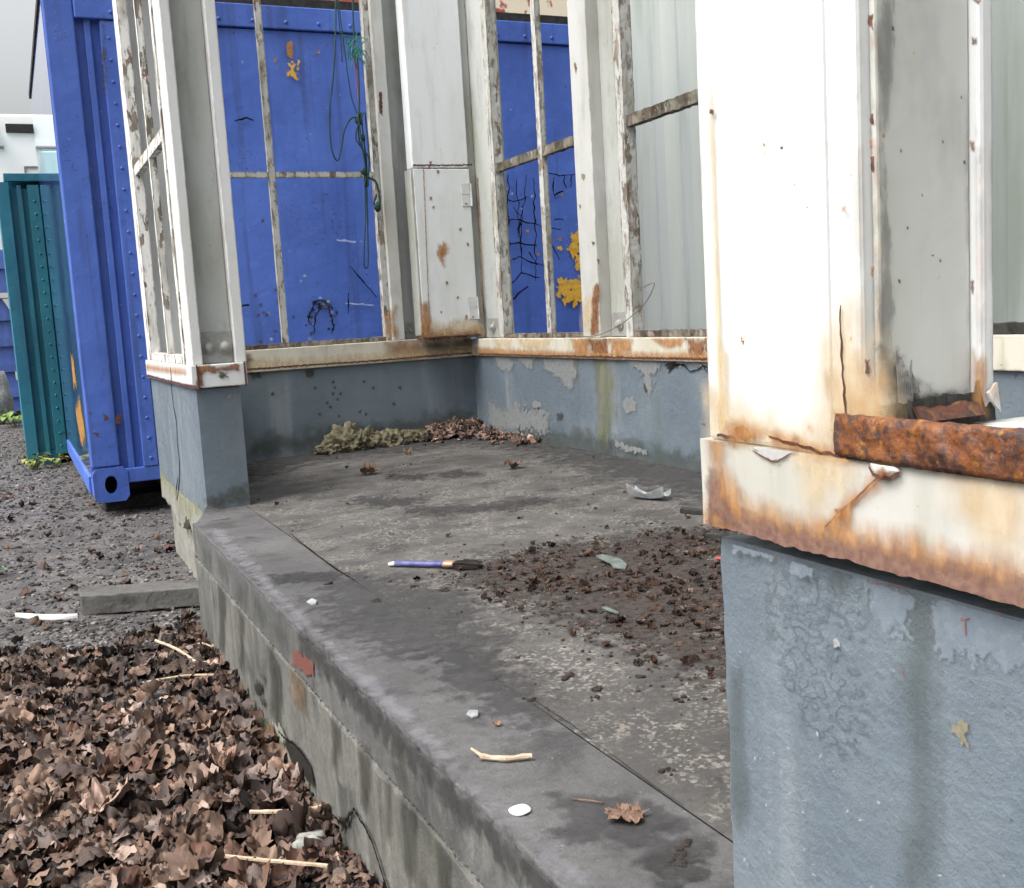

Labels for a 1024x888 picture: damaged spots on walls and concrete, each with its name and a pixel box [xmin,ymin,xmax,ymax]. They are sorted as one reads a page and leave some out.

rust [146,283,708,389]
peeling [495,356,578,391]
peeling [628,360,708,397]
peeling [485,396,552,436]
peeling [615,440,647,455]
rust [707,442,1024,607]